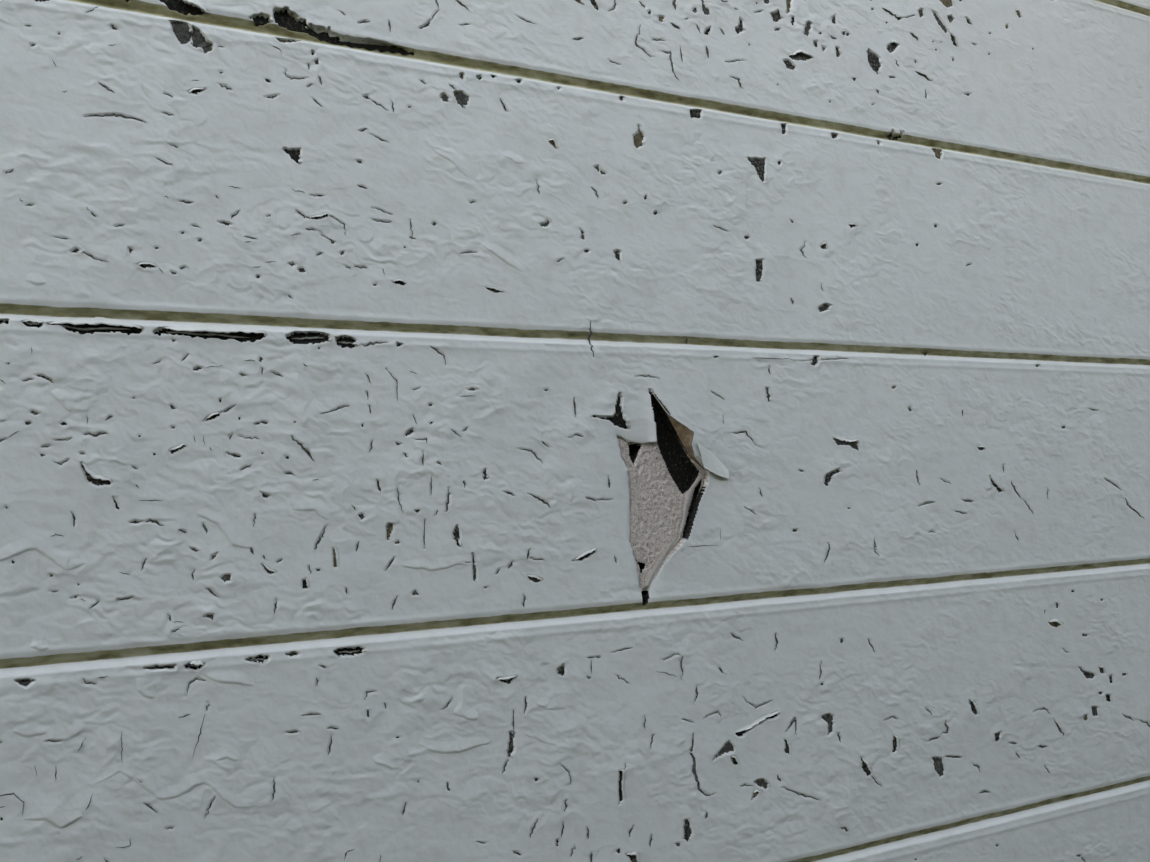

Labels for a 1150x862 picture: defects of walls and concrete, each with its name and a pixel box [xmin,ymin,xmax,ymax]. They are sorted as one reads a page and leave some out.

spalling [159,0,213,53]
spalling [250,9,414,56]
peeling [692,0,711,35]
peeling [764,0,849,70]
peeling [868,40,899,74]
peeling [919,0,971,47]
spalling [0,317,266,343]
spalling [286,332,359,348]
peeling [598,390,729,590]
peeling [714,711,780,765]
peeling [822,714,833,736]
peeling [932,757,946,777]